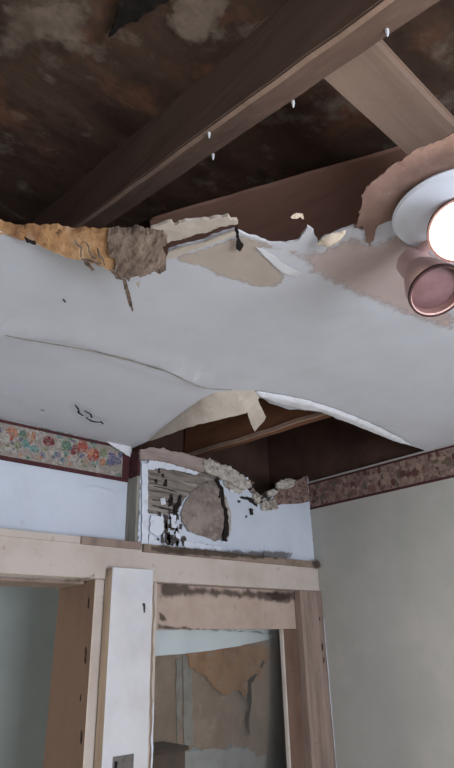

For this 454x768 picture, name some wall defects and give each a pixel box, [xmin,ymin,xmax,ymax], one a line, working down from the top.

peeling [179,237,283,286]
crack [6,335,232,390]
peeling [141,463,222,551]
flaking render [202,458,296,511]
flaking render [142,583,266,768]